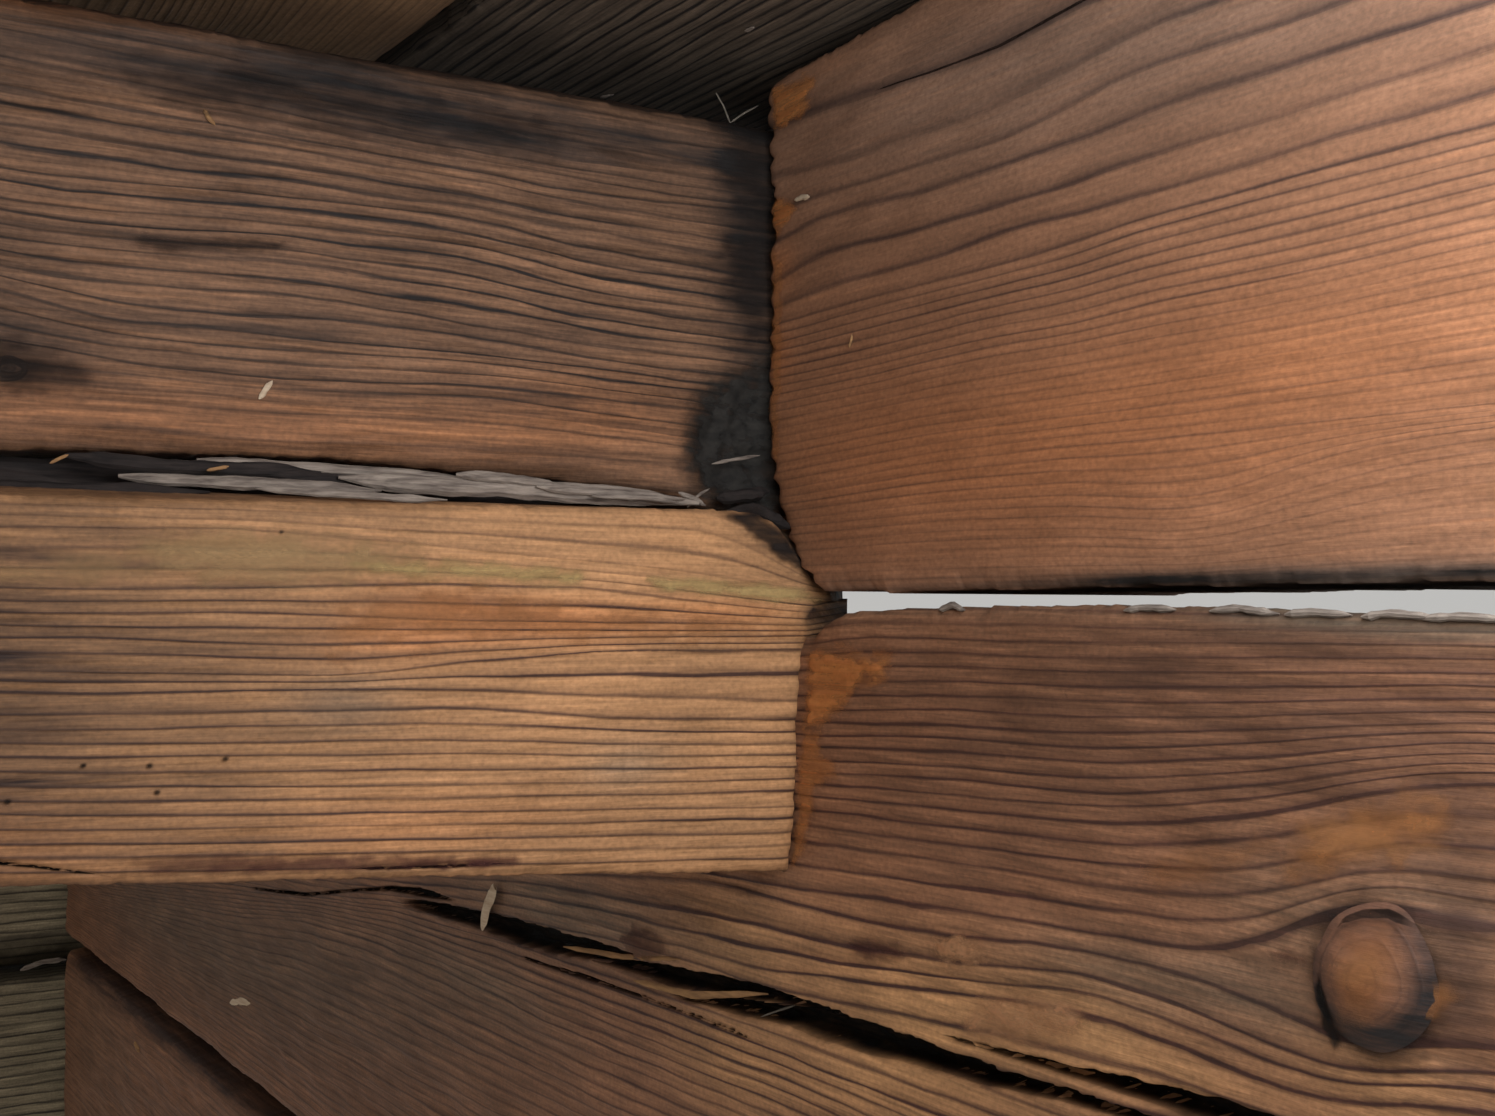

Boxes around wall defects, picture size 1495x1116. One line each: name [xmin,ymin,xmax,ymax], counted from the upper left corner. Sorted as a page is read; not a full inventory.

crack [0,861,94,874]
crack [1340,909,1412,926]
crack [254,863,1275,1116]
crack [1315,977,1341,1048]